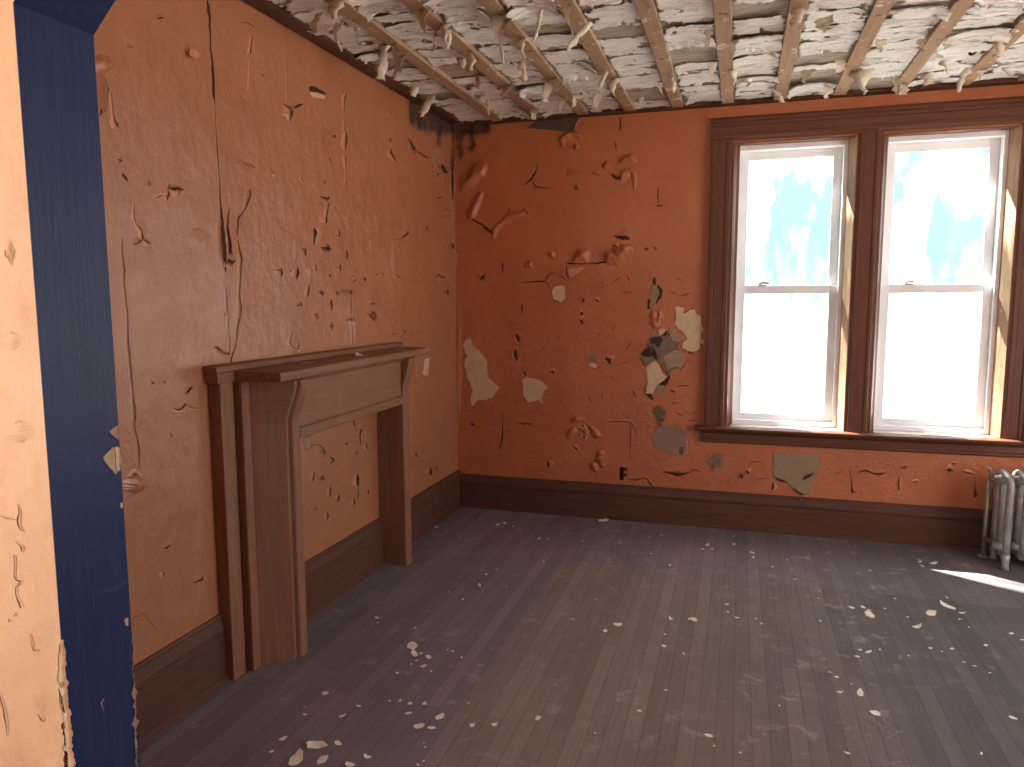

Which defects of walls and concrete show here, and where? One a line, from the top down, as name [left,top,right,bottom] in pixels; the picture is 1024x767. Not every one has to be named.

peeling [268,0,1024,133]
leakage [410,101,490,170]
crack [204,0,253,363]
flaking render [647,276,663,309]
crack [120,237,141,471]
flaking render [462,337,500,407]
flaking render [521,376,548,405]
peeling [639,305,704,400]
spalling [102,426,121,475]
flaking render [651,424,688,456]
flaking render [772,452,821,495]
spalling [56,640,76,767]